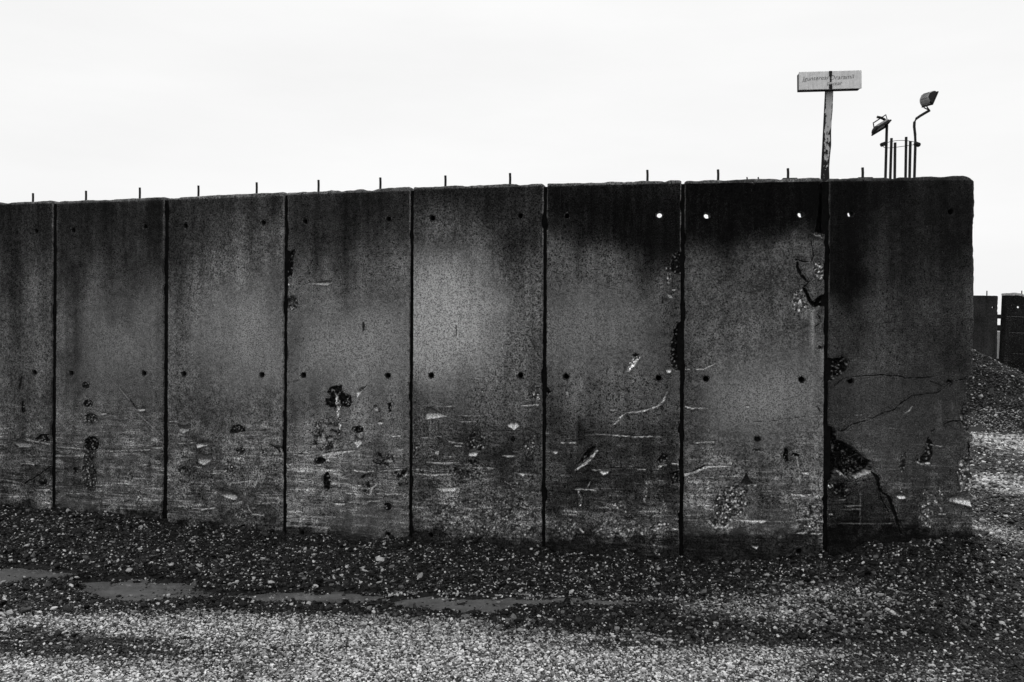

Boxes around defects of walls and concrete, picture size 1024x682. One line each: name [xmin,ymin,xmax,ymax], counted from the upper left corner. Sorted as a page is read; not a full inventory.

crack [793,235,816,288]
crack [753,372,951,433]
spalling [310,382,394,507]
spalling [794,424,875,536]
crack [836,467,904,537]